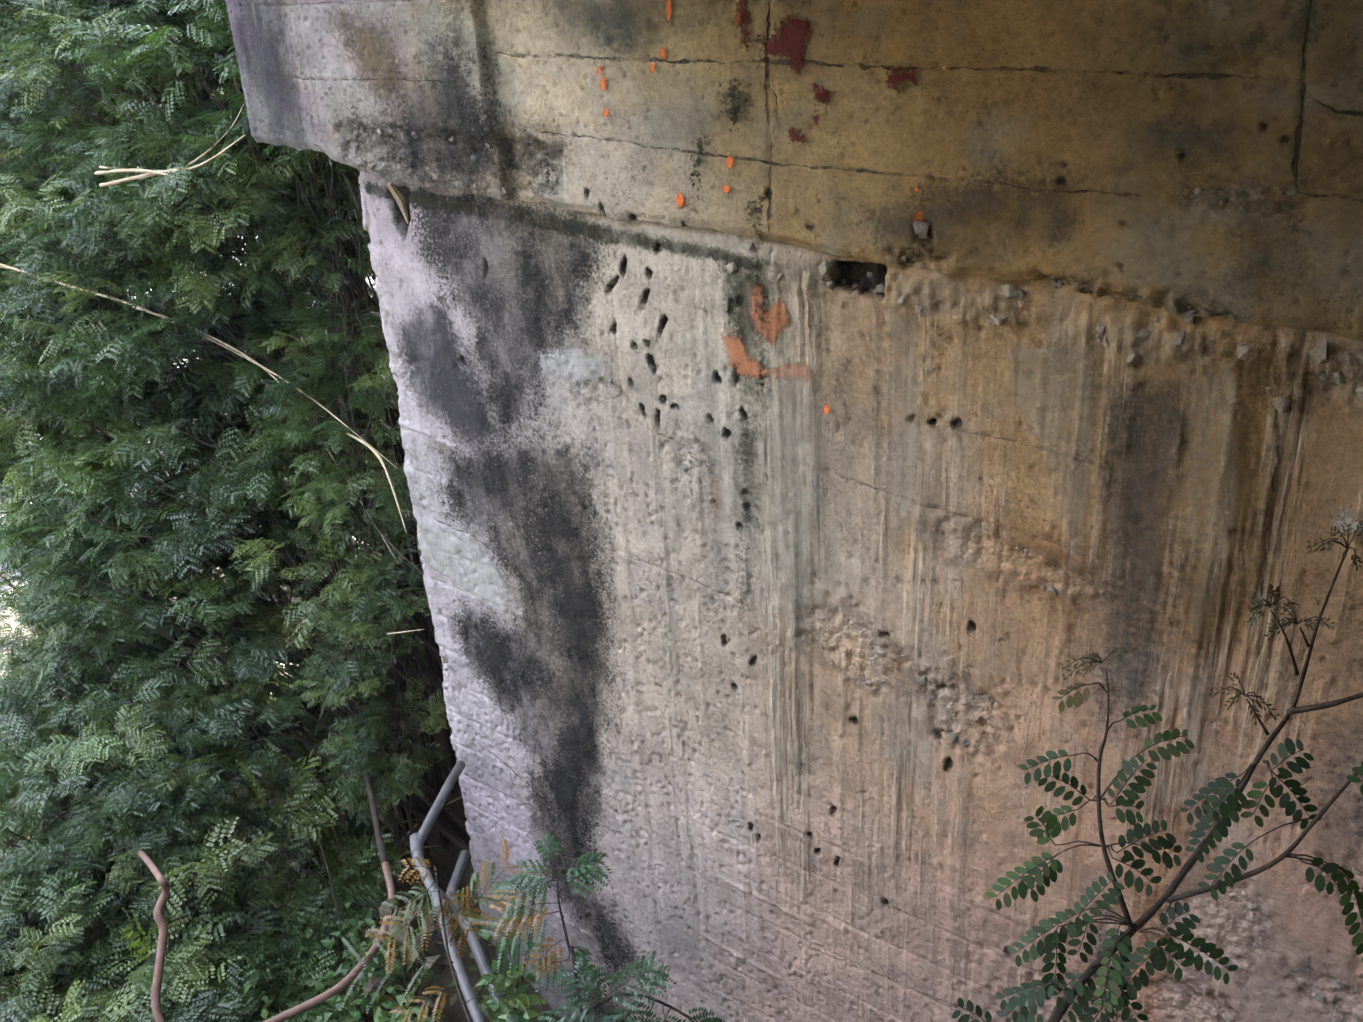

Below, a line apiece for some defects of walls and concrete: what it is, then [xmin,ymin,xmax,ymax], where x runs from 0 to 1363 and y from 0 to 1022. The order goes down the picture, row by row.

crack [764,5,778,232]
crack [1266,0,1363,201]
spalling [831,221,949,297]
spalling [1049,276,1236,324]
leakage [347,0,770,1022]